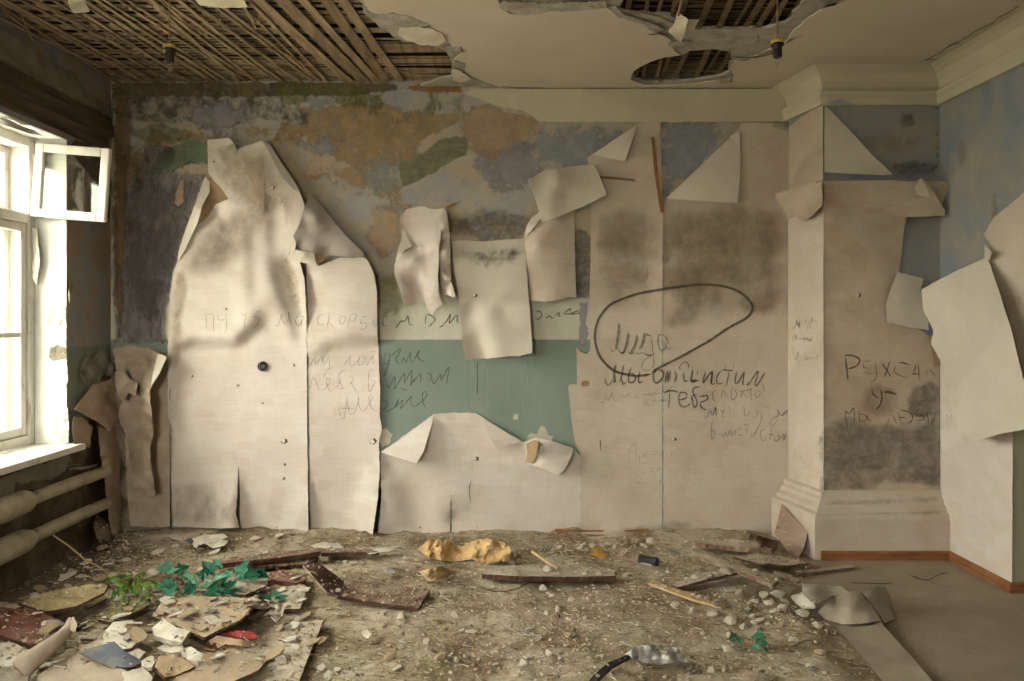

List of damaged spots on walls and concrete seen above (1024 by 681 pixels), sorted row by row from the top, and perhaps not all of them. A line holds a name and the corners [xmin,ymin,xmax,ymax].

flaking render [0,0,497,221]
flaking render [499,0,841,84]
flaking render [0,347,171,593]